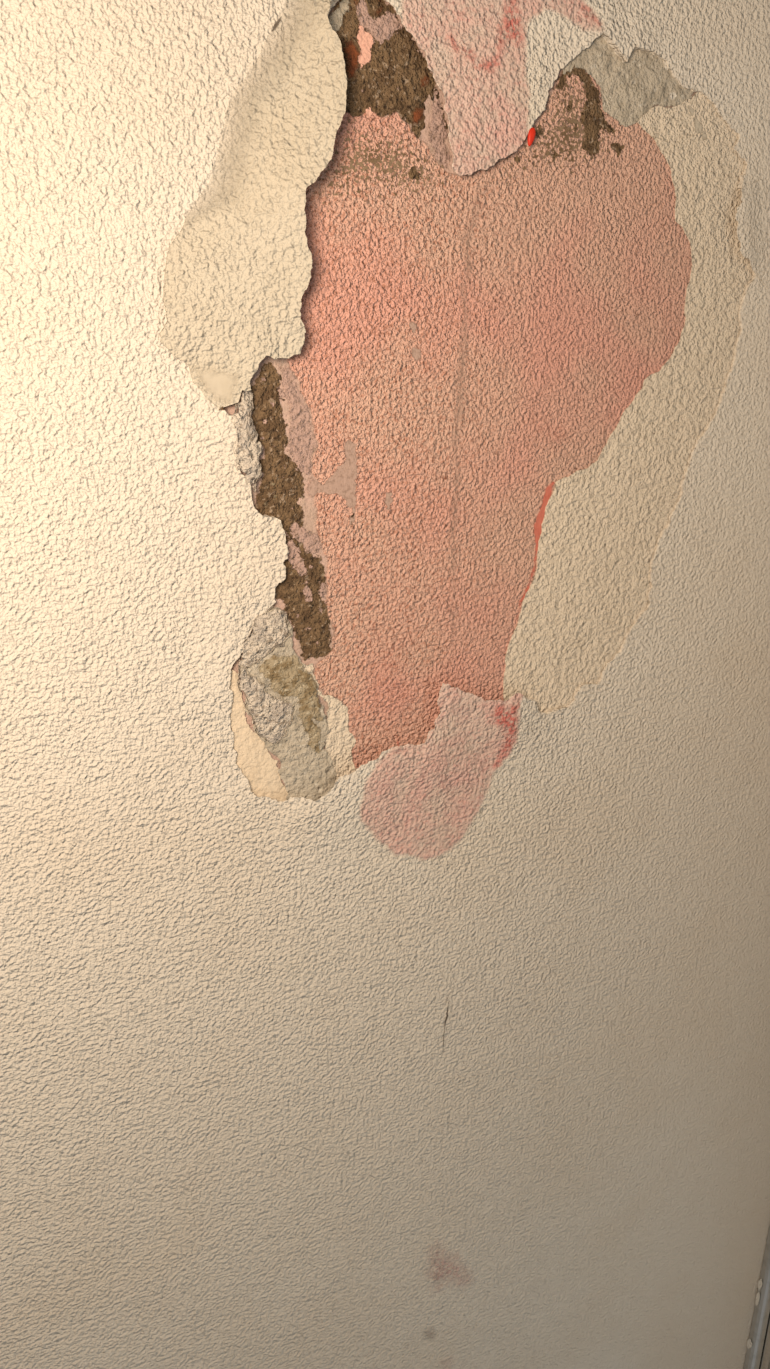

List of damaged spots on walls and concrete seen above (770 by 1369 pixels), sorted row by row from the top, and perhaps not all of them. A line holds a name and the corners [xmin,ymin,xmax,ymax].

flaking render [223,0,770,872]